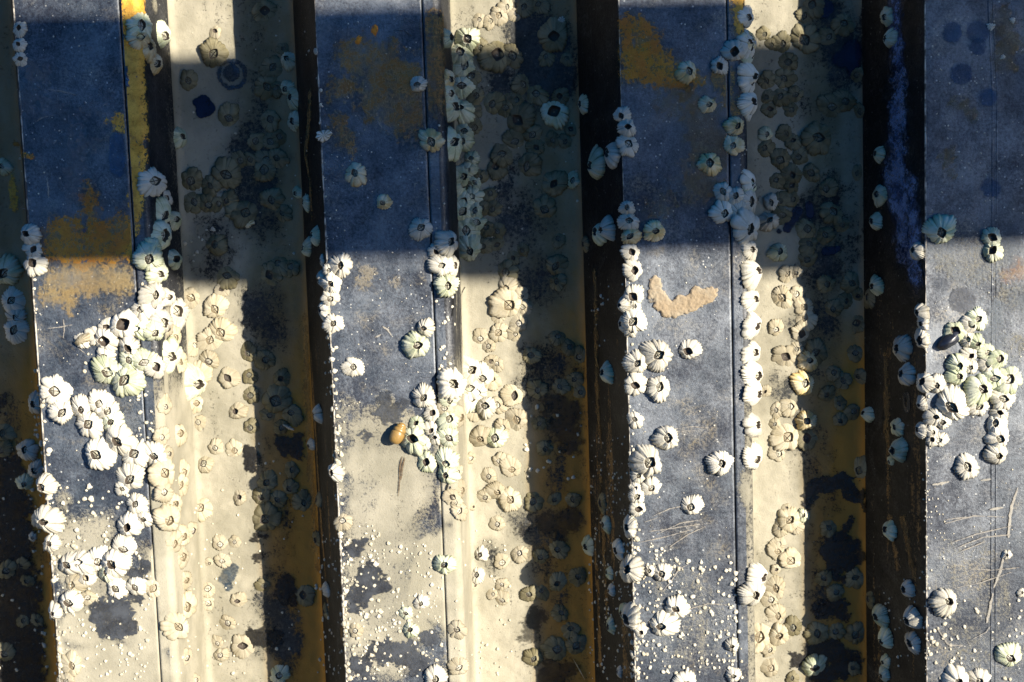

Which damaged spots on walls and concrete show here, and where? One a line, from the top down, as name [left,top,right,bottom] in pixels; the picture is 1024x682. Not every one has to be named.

corrosion [617,11,740,117]
corrosion [38,0,151,317]
peeling [371,390,412,425]
peeling [126,556,151,580]
peeling [344,537,392,614]
peeling [88,593,145,640]
peeling [349,629,440,680]